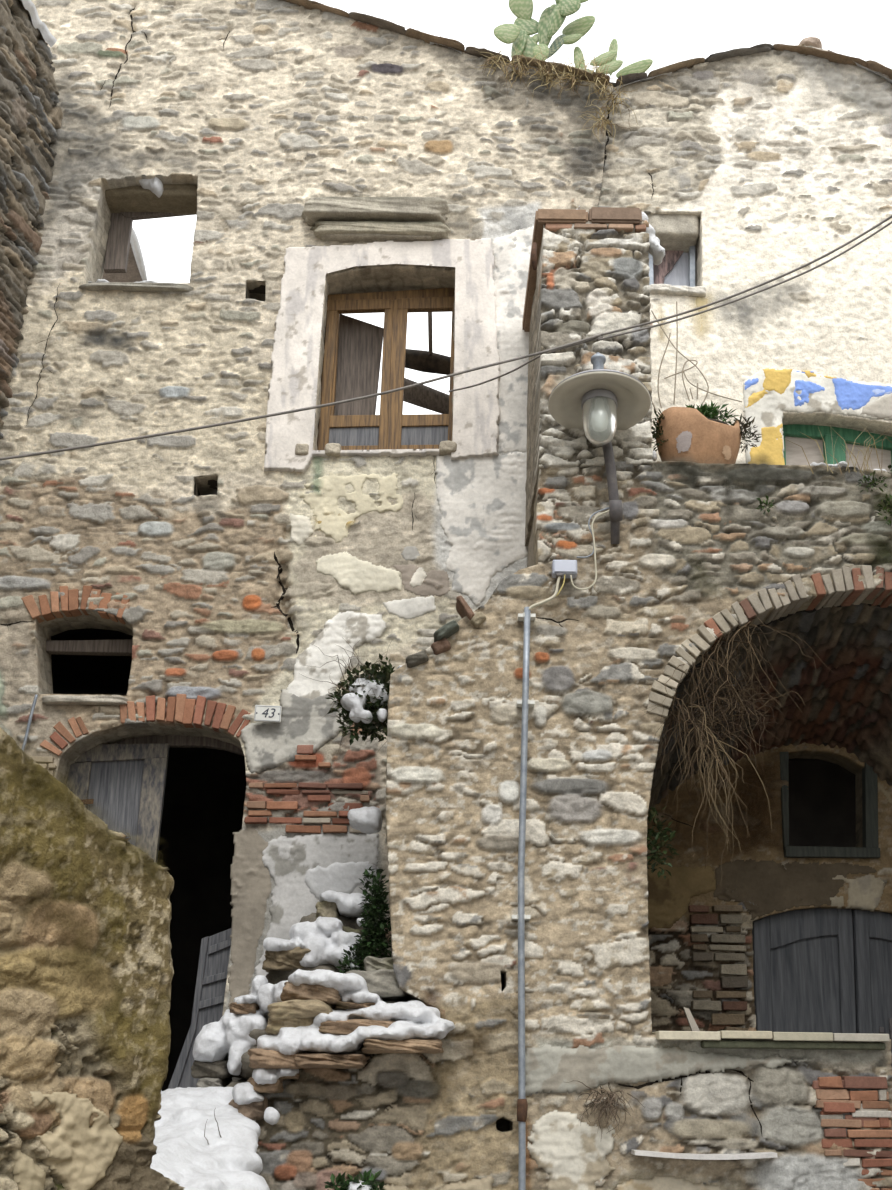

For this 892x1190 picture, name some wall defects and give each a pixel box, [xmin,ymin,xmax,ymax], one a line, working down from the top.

crack [101,8,148,107]
peeling [743,368,892,465]
crack [271,552,299,654]
peeling [228,226,534,1008]